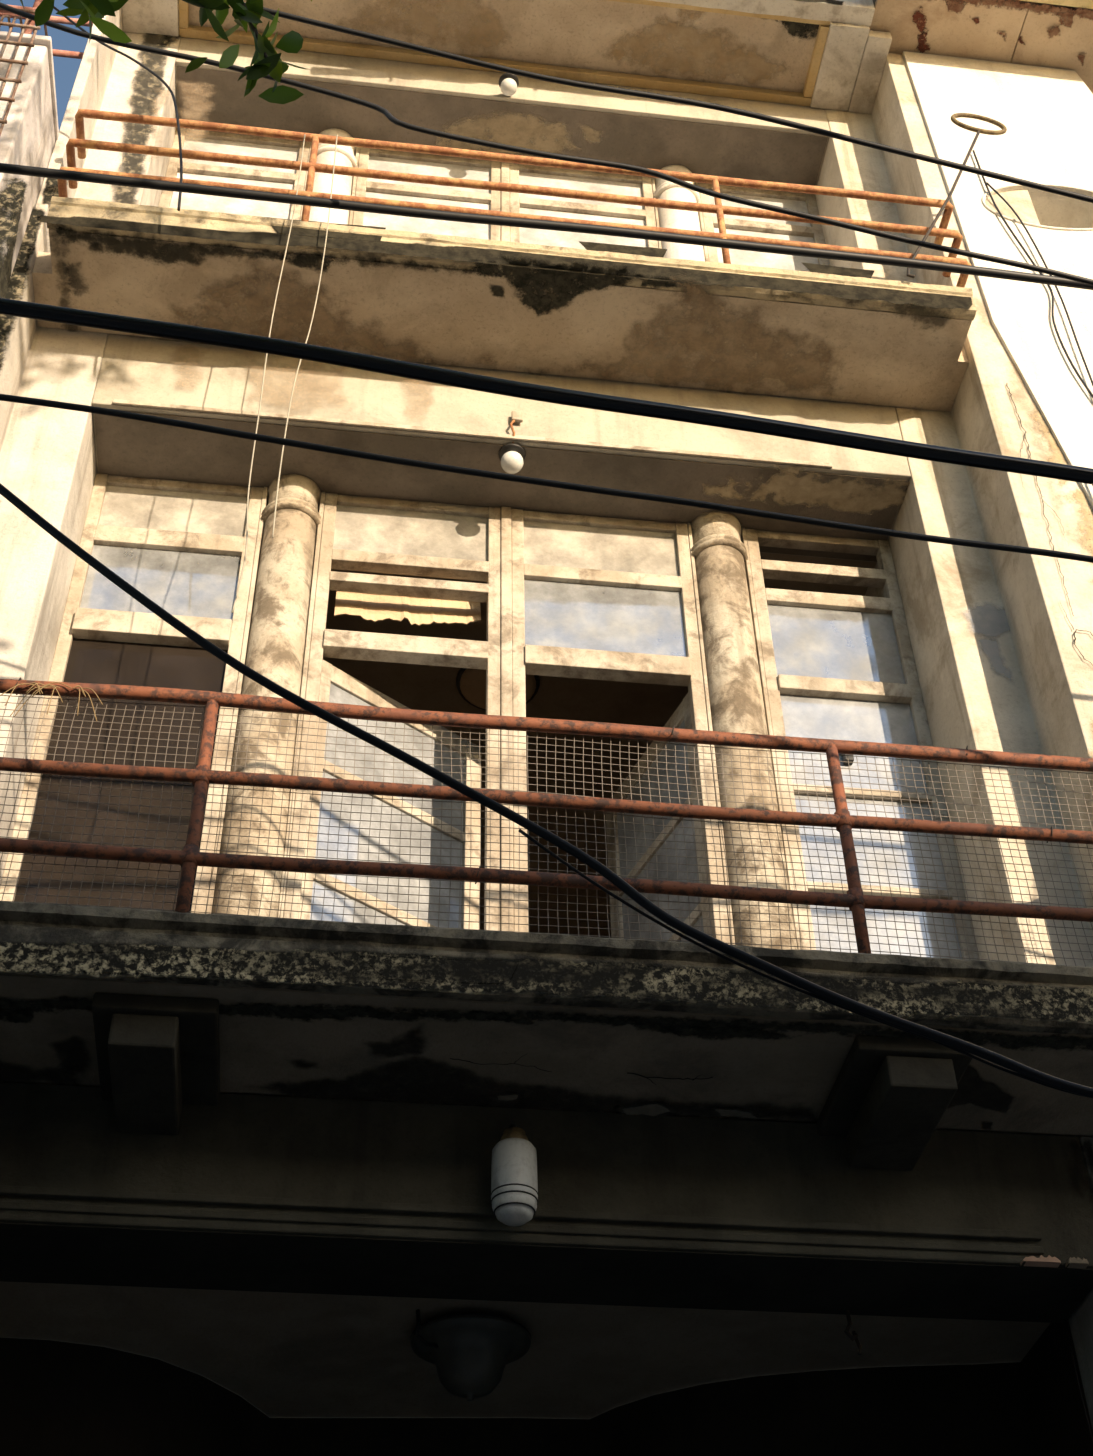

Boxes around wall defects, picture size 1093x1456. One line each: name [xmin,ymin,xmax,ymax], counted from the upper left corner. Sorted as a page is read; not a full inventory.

rust [928,0,1093,38]
leakage [0,192,24,298]
leakage [40,216,973,394]
peeling [704,465,910,514]
crack [1006,383,1093,664]
leakage [0,996,93,1023]